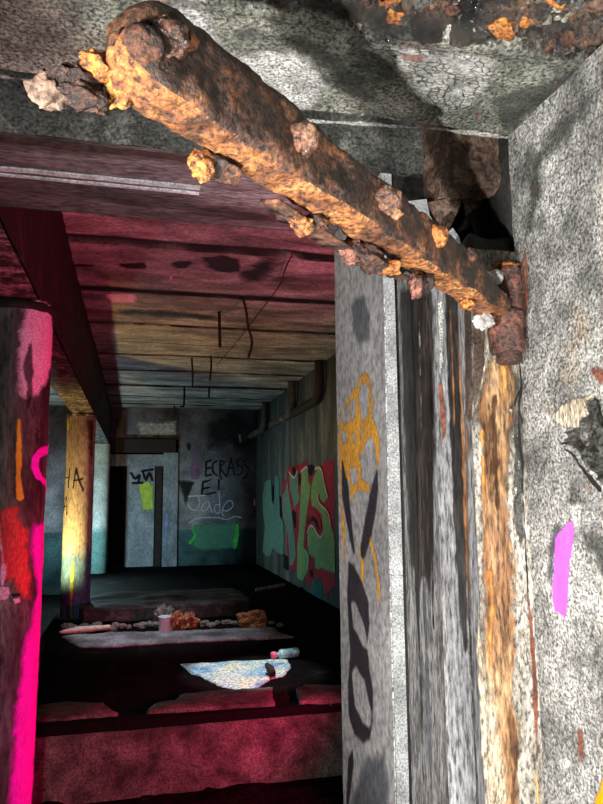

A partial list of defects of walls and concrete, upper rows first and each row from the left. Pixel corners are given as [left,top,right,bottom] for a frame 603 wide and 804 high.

crack [426,88,468,109]
leakage [400,289,434,790]
leakage [445,293,504,804]
corrosion [478,360,520,804]
spalling [553,392,603,492]